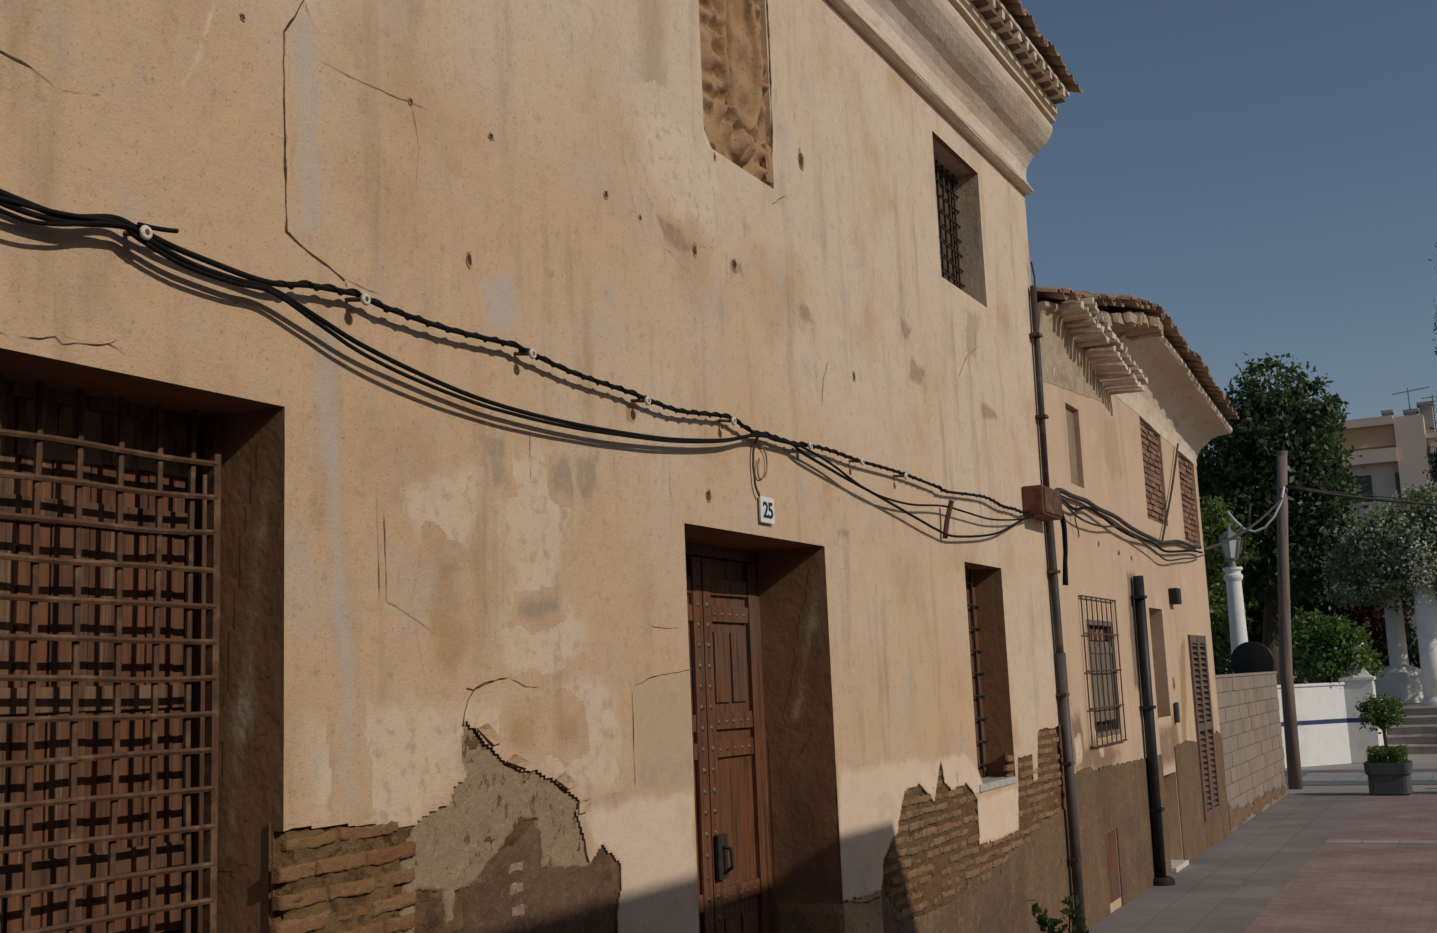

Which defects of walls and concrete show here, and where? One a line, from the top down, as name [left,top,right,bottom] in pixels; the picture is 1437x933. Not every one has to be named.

crack [0,50,100,95]
crack [283,0,379,294]
peeling [269,723,620,933]
flaking render [883,728,1104,922]